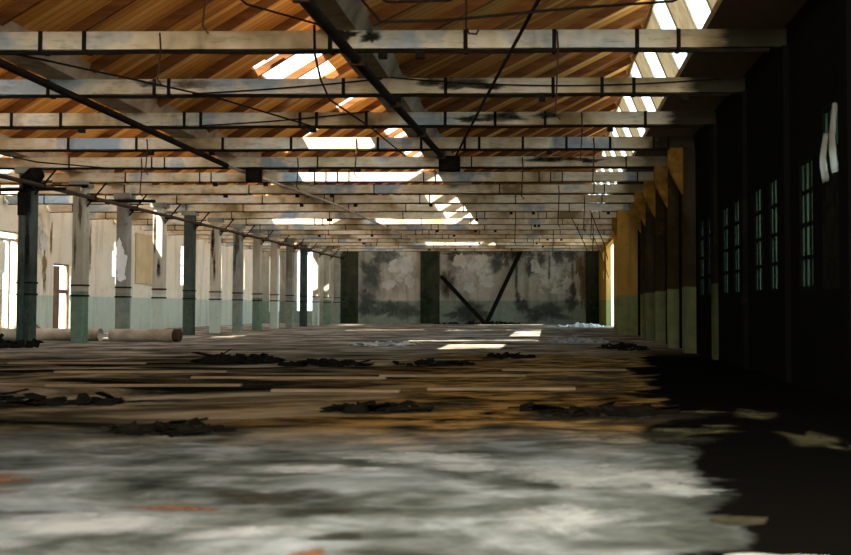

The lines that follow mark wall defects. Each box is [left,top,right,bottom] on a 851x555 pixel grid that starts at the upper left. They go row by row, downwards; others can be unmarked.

spalling [114,237,127,287]
water stain [359,252,420,319]
water stain [444,251,578,322]